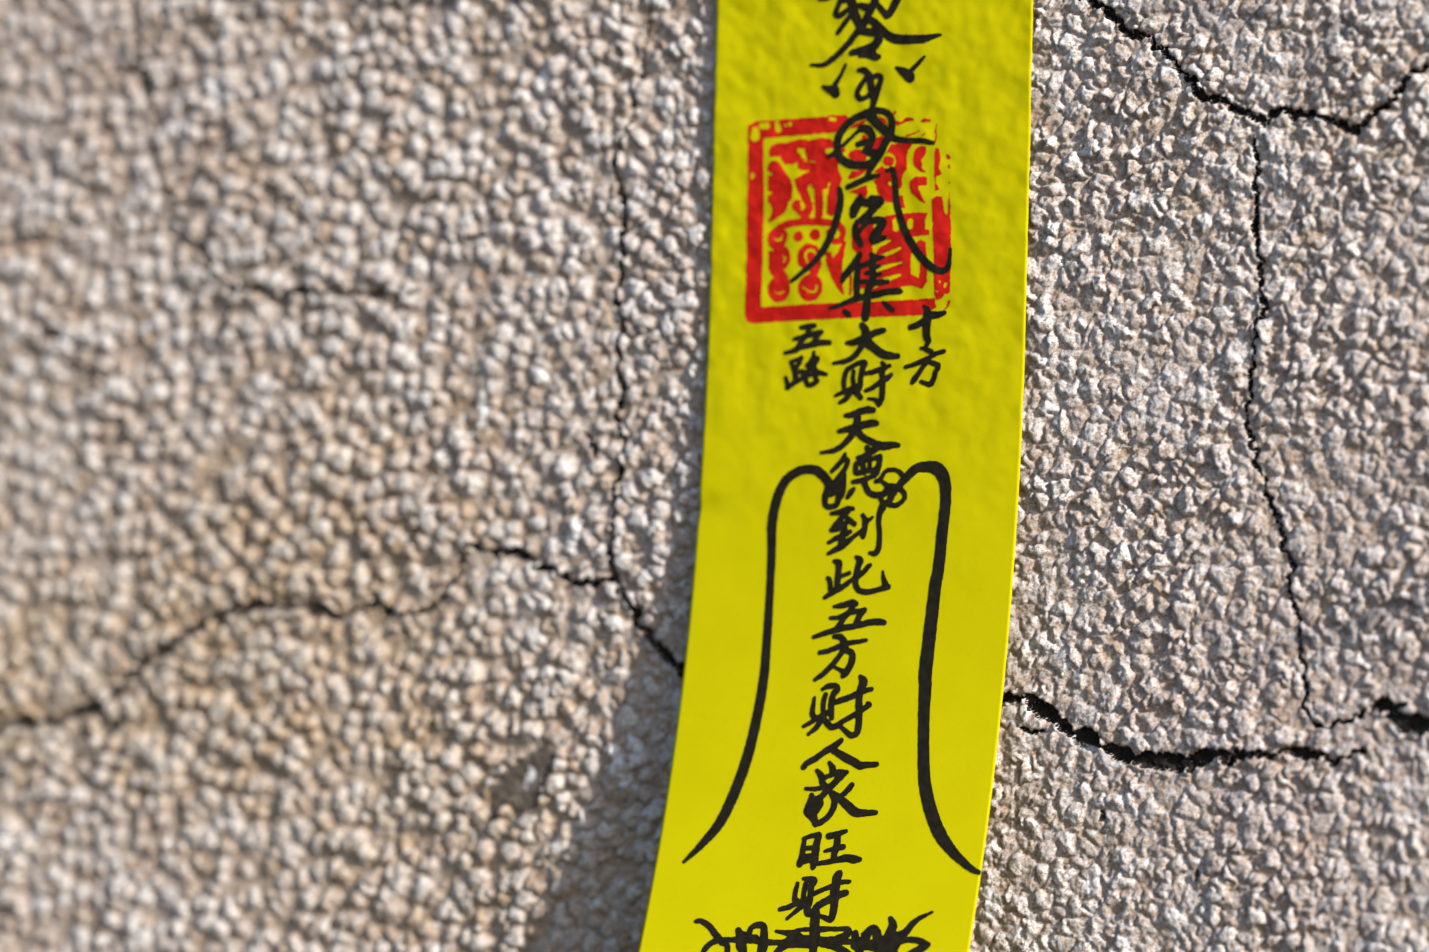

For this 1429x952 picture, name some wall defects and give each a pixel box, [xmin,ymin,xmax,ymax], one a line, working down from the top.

crack [0,0,685,753]
crack [1002,0,1429,774]